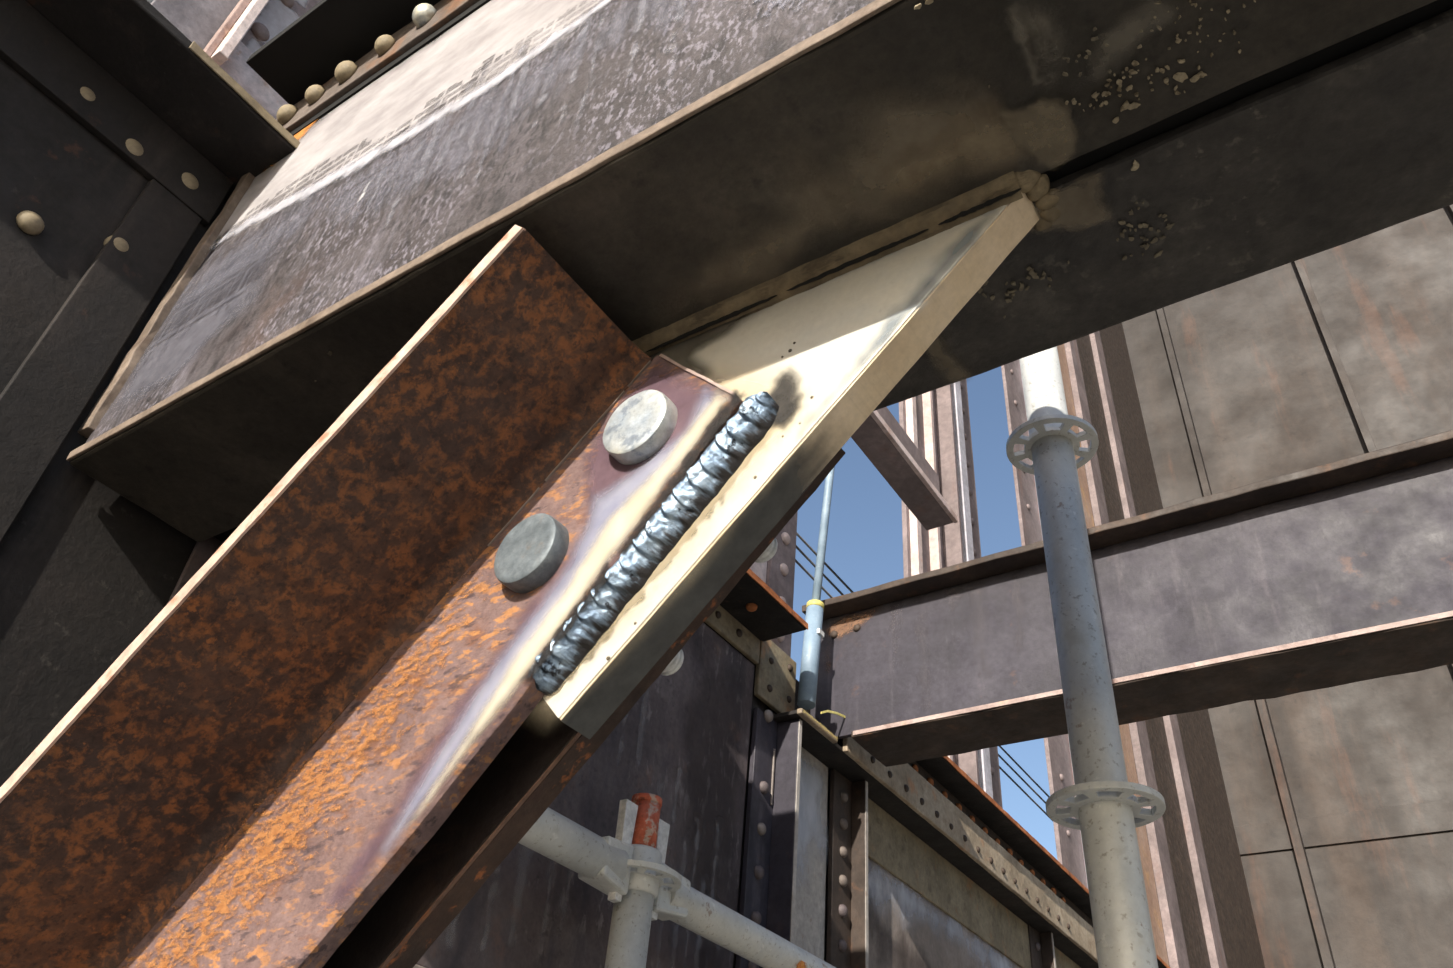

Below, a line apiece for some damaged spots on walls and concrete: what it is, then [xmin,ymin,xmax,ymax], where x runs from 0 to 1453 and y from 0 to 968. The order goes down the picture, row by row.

peeling [1065,0,1256,124]
peeling [978,266,1052,318]
peeling [1116,201,1175,260]
rust [128,572,481,968]